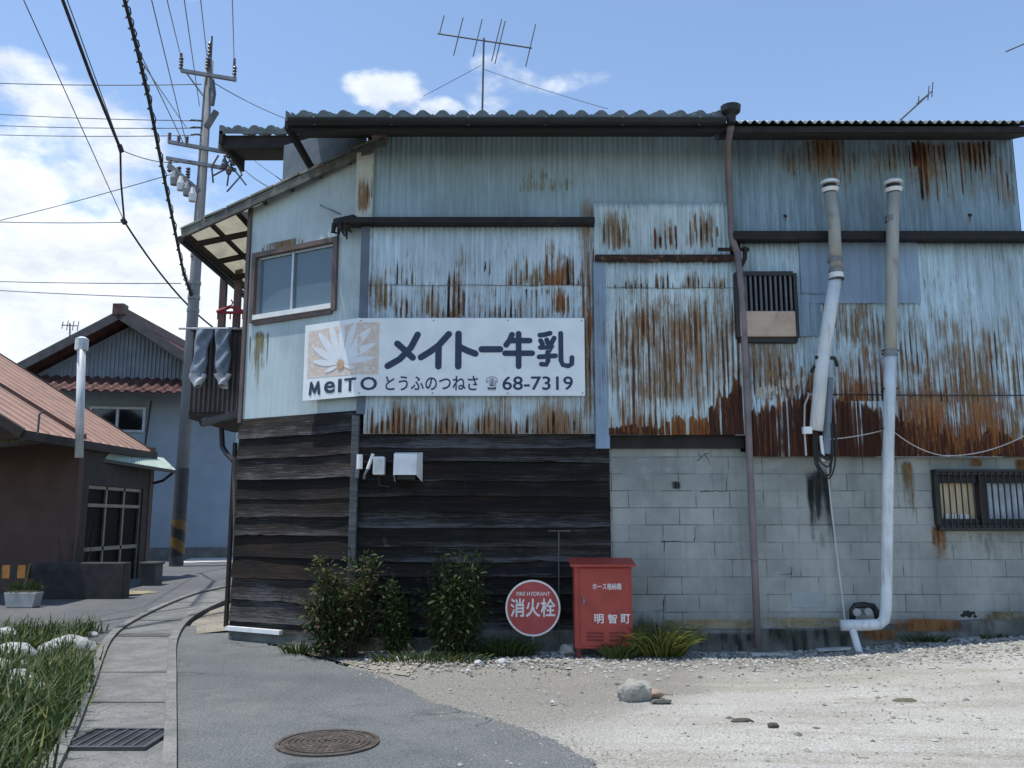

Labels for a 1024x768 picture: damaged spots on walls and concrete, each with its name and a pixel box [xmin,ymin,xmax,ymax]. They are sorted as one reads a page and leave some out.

rust [358,182,372,211]
rust [782,140,1014,202]
rust [249,332,268,379]
rust [367,202,1024,499]
damp [808,471,830,522]
rust [932,527,946,554]